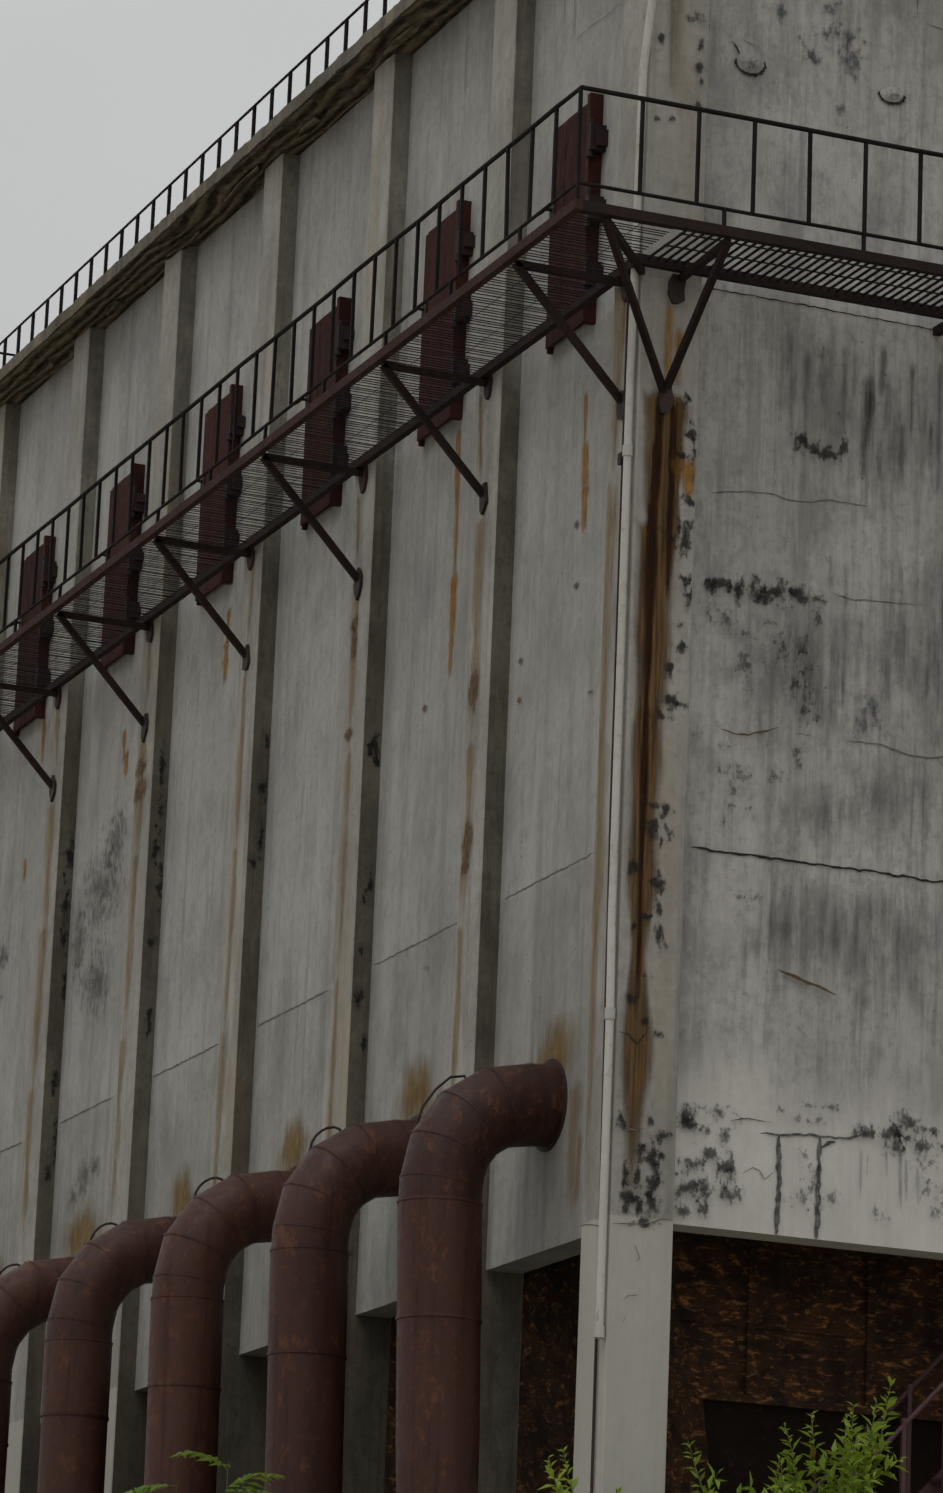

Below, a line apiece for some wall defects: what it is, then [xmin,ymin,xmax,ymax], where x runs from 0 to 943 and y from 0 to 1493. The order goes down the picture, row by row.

corrosion [665,305,683,381]
mould [676,393,697,465]
corrosion [449,432,460,674]
mould [670,494,695,557]
mould [665,624,686,677]
mould [680,574,826,722]
mould [657,695,686,720]
corrosion [623,393,695,1169]
crack [692,847,943,883]
corrosion [452,933,461,1074]
water stain [800,1153,835,1211]